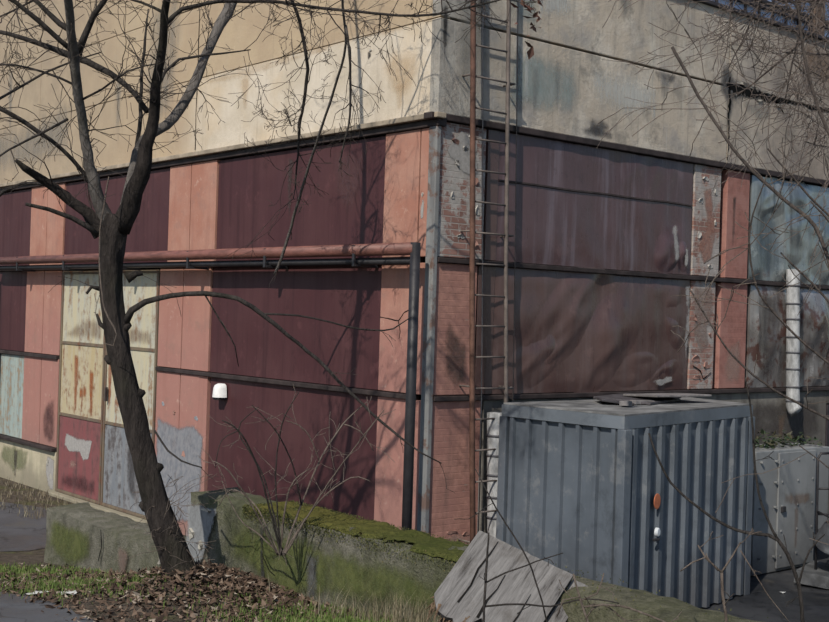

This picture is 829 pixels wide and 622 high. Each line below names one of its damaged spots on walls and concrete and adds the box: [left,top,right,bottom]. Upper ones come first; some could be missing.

damp [514,59,572,106]
damp [587,121,608,135]
peeling [447,132,479,185]
peeling [698,177,718,268]
rust [74,358,93,408]
damp [2,447,26,469]
peeling [65,434,92,460]
peeling [156,416,216,562]